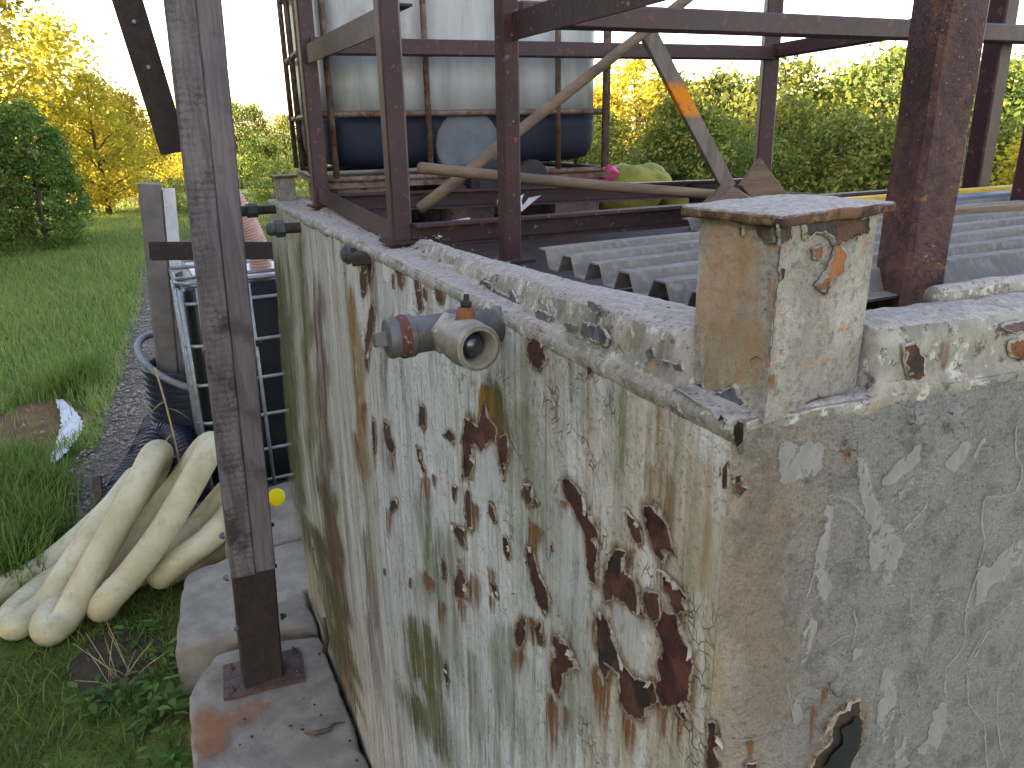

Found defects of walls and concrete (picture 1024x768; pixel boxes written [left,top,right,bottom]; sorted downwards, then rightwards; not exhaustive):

peeling [739,217,870,296]
peeling [458,271,611,373]
peeling [901,341,927,383]
peeling [999,319,1024,361]
peeling [441,401,510,549]
peeling [502,535,581,697]
peeling [555,476,696,723]
damp [410,617,433,725]
peeling [824,701,854,738]